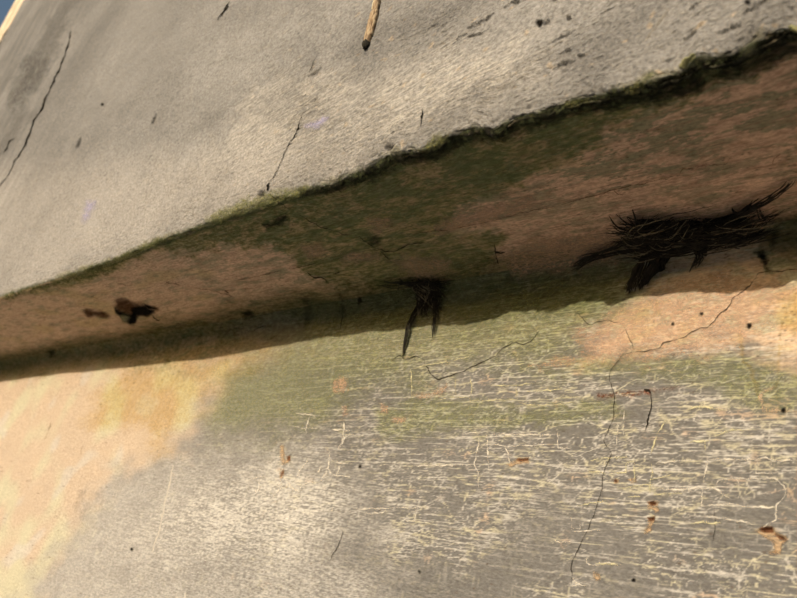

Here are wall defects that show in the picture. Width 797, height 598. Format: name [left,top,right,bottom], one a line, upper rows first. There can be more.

crack [0,31,71,185]
spalling [116,301,159,324]
crack [394,331,539,380]
crack [571,269,795,581]